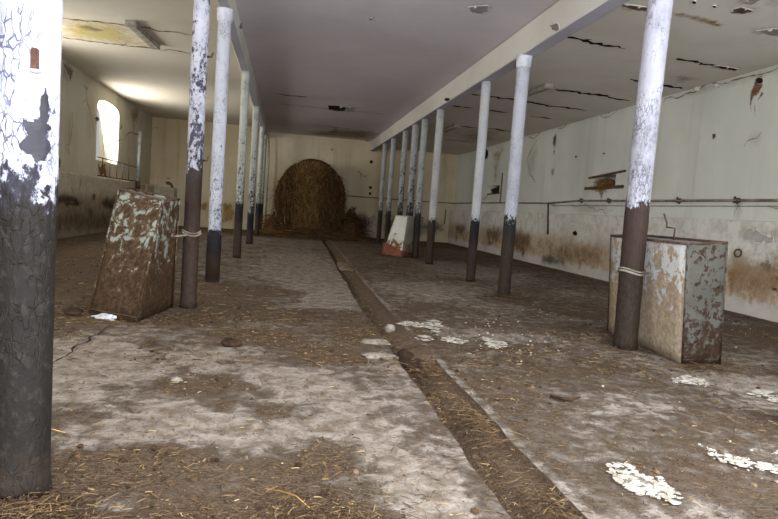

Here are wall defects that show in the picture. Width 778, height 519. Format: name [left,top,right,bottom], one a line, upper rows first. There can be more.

crack [567,37,625,49]
peeling [755,28,778,37]
crack [663,58,778,103]
rust [750,79,763,104]
peeling [19,87,51,163]
crack [446,89,629,182]
water stain [57,196,113,230]
crack [53,326,109,363]